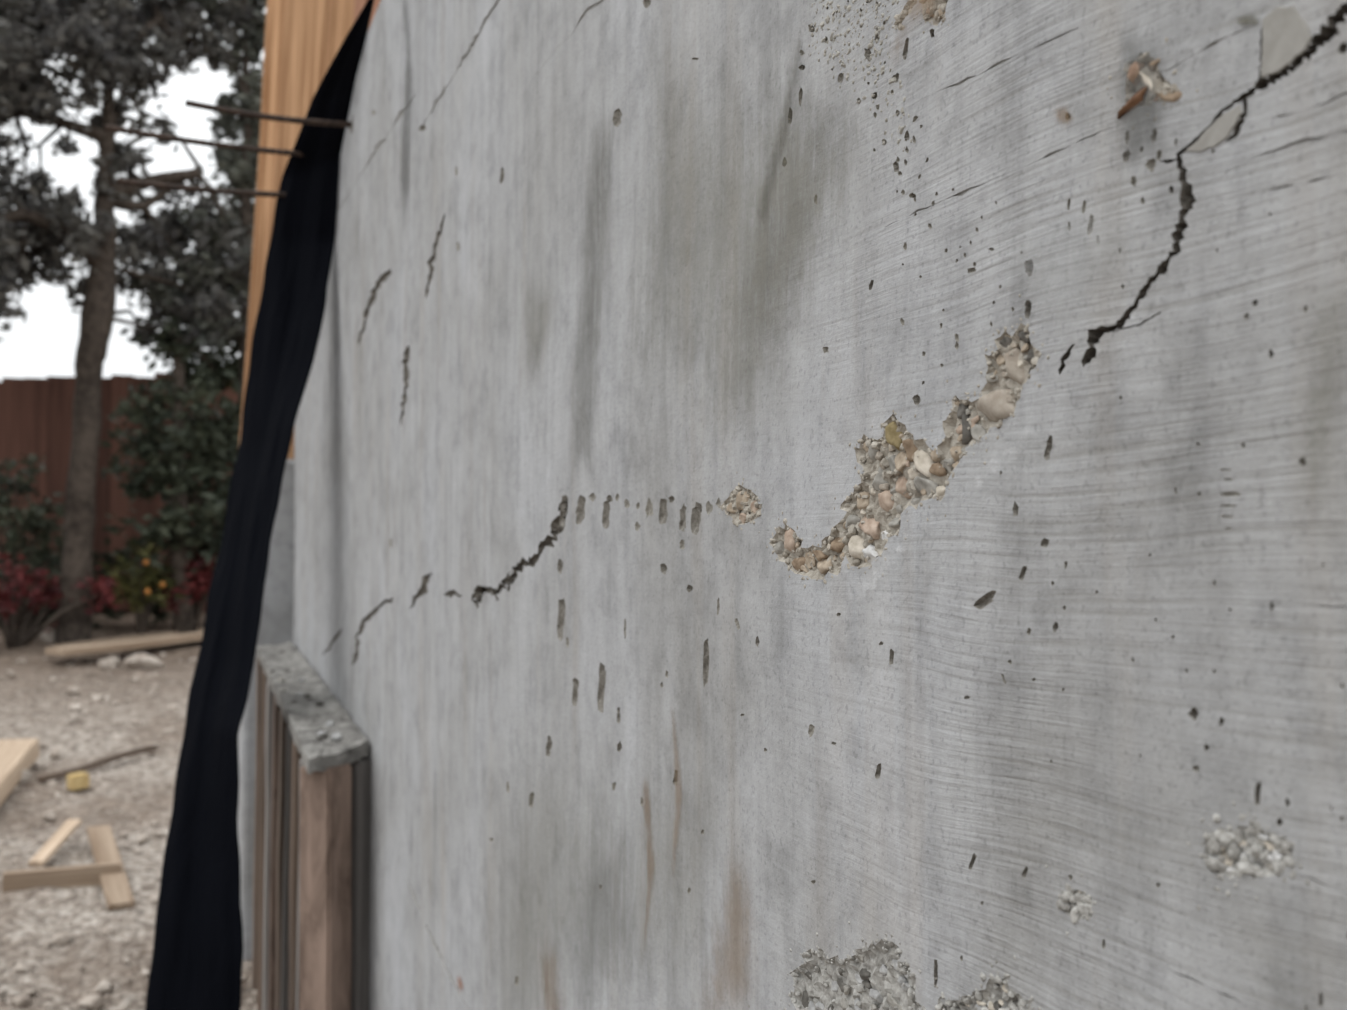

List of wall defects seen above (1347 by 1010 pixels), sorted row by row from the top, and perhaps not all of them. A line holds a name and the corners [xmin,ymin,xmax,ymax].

peeling [808,0,954,229]
crack [1058,3,1347,375]
crack [322,501,568,665]
spalling [1186,801,1310,911]